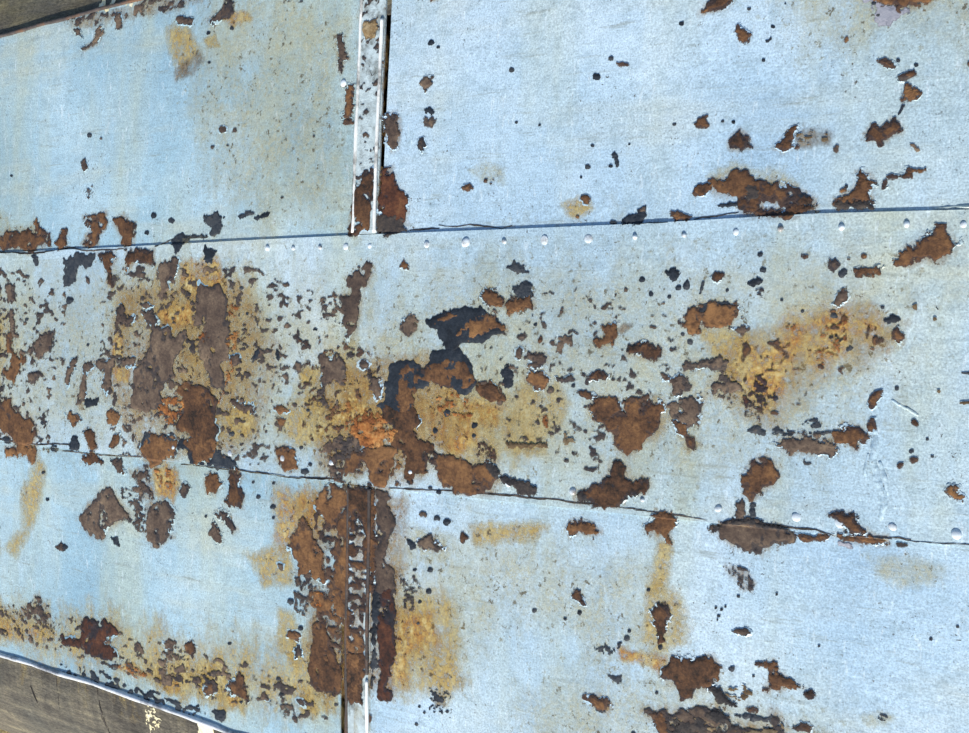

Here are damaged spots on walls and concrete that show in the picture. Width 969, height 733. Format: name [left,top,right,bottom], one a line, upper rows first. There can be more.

peeling [863,0,910,27]
rust [347,165,410,239]
peeling [669,210,693,223]
rust [576,223,964,510]
peeling [495,295,608,473]
rust [0,211,565,726]
crack [478,493,593,505]
crack [618,507,707,521]
rust [707,457,908,555]
crack [764,523,834,536]
crack [879,536,969,545]
peeling [734,707,773,723]